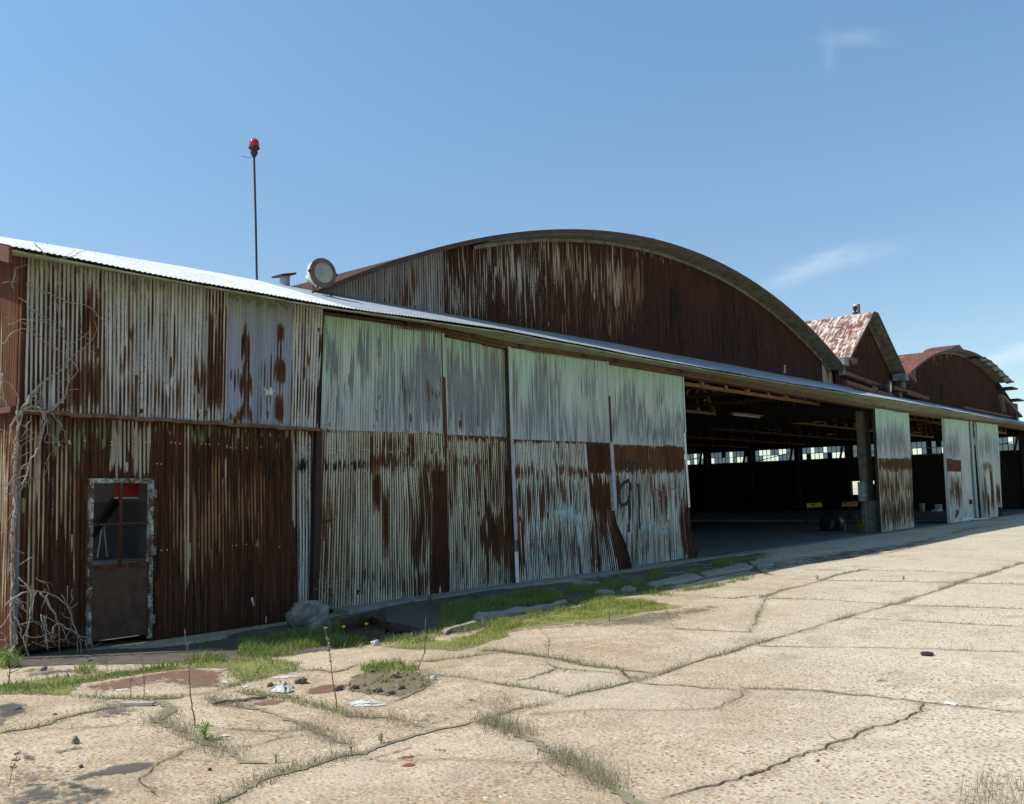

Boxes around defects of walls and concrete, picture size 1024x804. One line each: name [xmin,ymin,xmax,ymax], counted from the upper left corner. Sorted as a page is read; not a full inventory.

corrosion [24,256,689,609]
corrosion [878,457,914,532]
corrosion [947,458,1003,518]
crack [509,663,630,680]
crack [112,748,213,795]
crack [225,727,301,748]
crack [661,704,932,798]